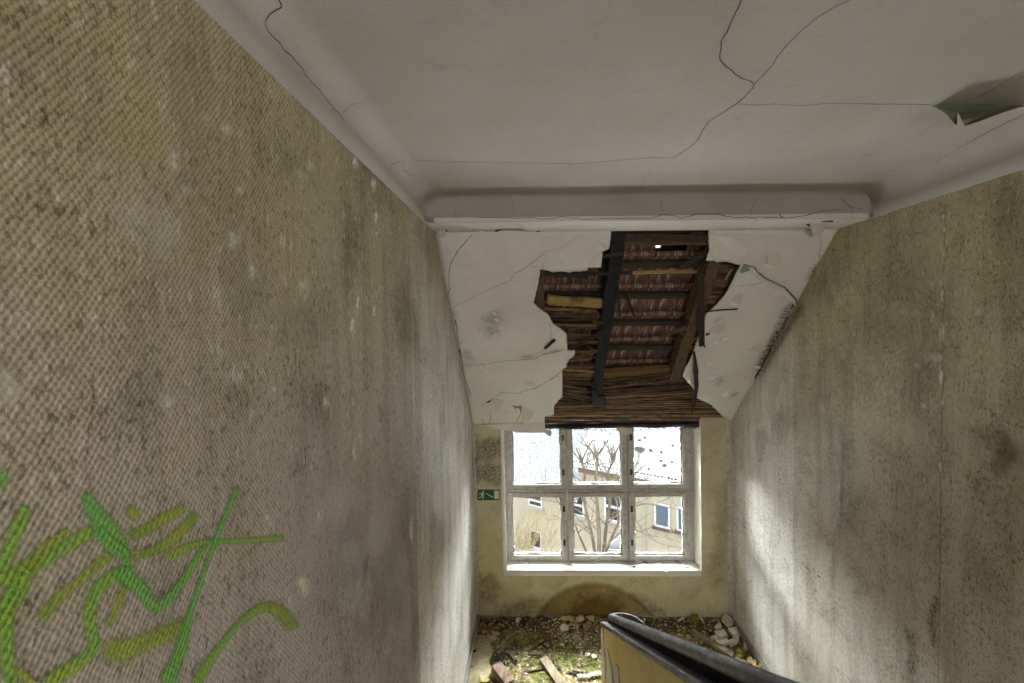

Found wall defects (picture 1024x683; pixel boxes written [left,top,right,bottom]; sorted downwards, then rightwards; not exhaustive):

crack [265,0,356,122]
crack [551,0,860,164]
peeling [931,102,1024,126]
crack [448,201,863,424]